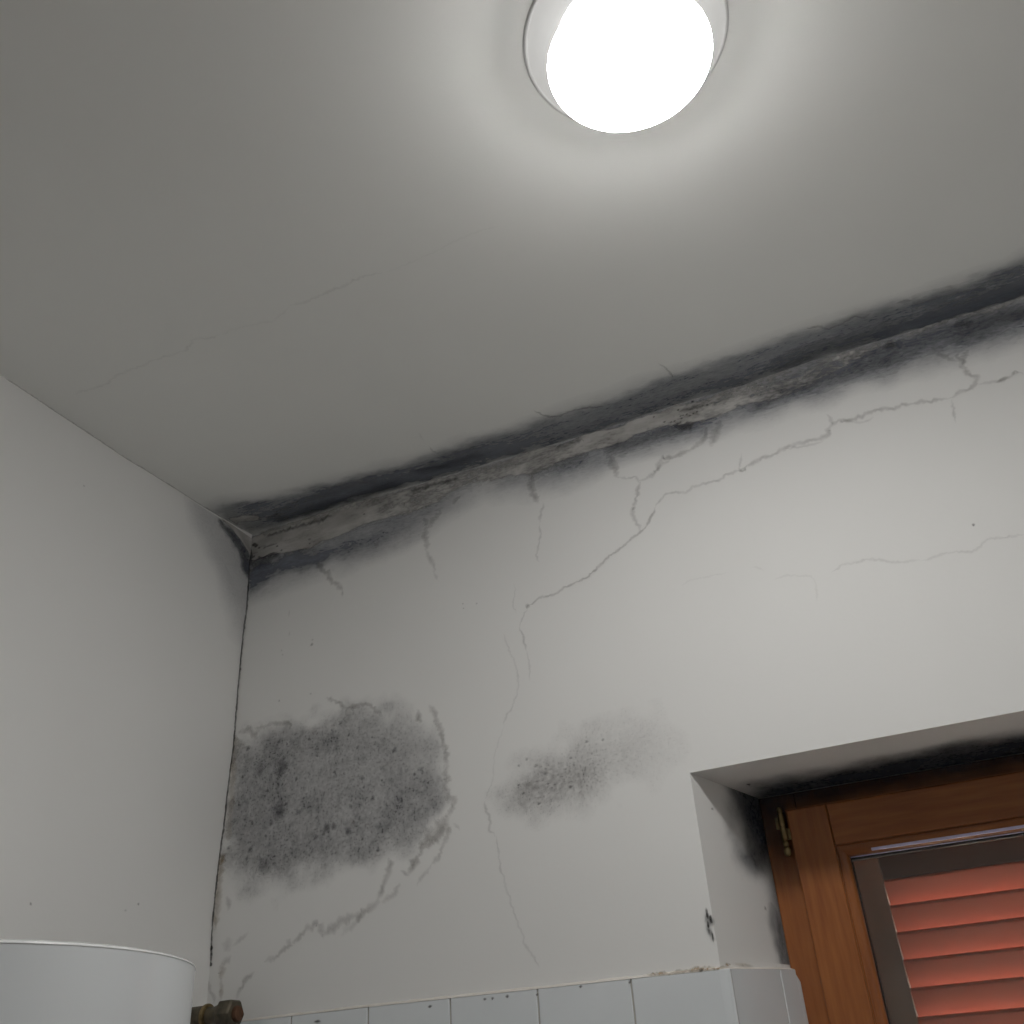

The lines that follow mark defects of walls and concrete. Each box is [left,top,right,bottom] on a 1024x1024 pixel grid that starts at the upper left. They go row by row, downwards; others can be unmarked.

water stain [220,262,1024,592]
water stain [232,720,441,870]
water stain [731,736,1024,869]